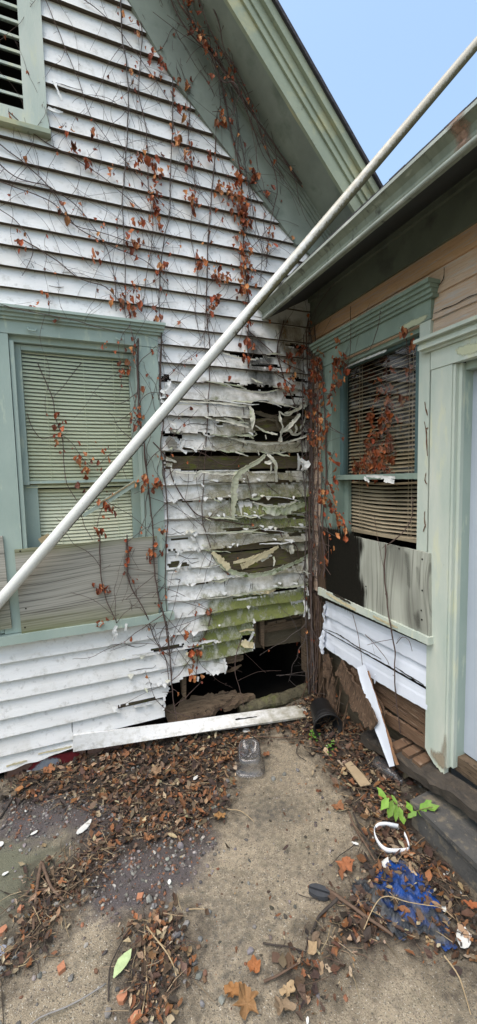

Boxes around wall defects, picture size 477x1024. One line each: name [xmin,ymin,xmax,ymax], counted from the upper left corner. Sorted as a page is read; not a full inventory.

corrosion [450,113,468,150]
peeling [160,381,197,454]
peeling [201,479,271,517]
peeling [168,515,207,586]
spalling [197,568,355,681]